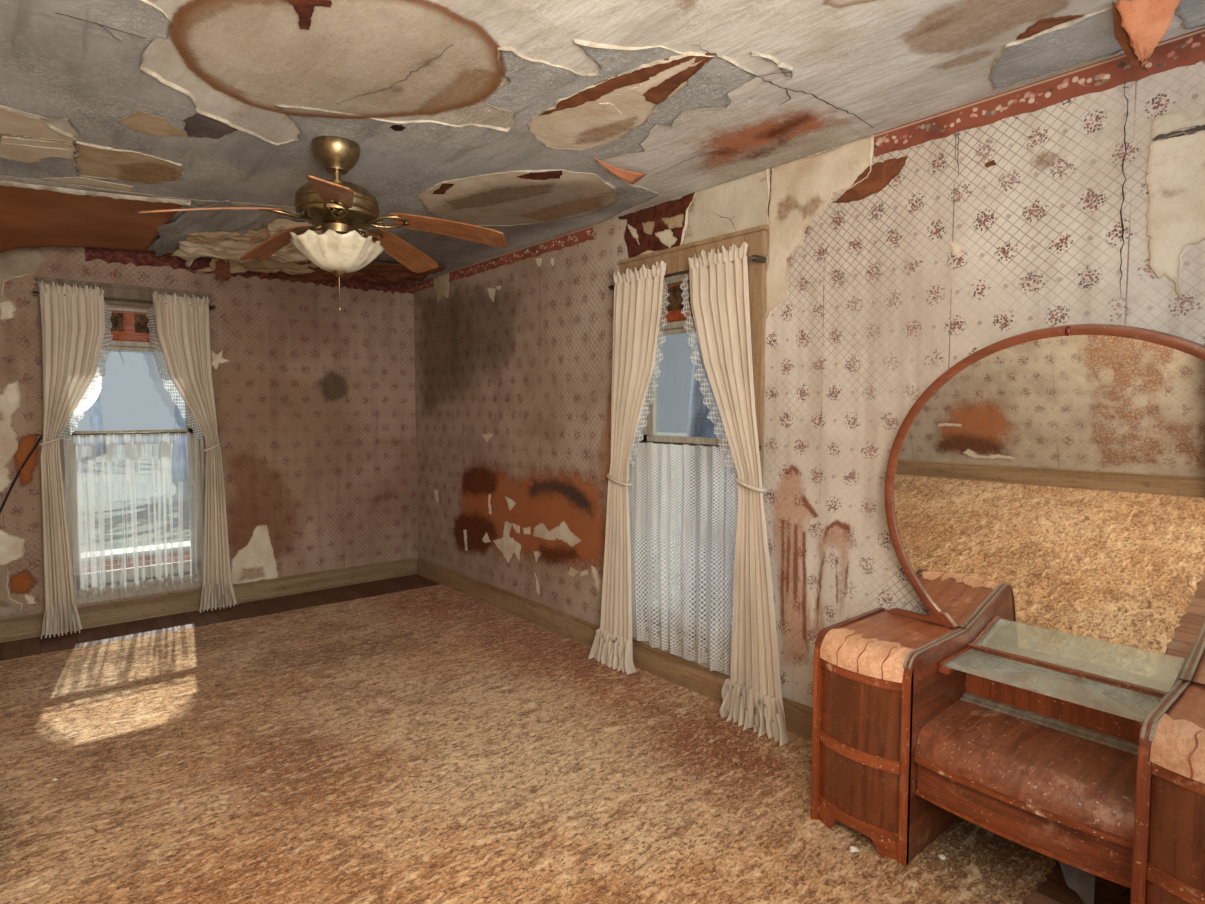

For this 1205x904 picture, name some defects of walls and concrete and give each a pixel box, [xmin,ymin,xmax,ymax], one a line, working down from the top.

damp [169,0,506,119]
crack [697,45,874,128]
peeling [989,3,1123,90]
peeling [1174,0,1205,30]
peeling [0,0,794,284]
damp [705,112,824,164]
crack [1120,83,1128,290]
peeling [4,383,20,413]
damp [320,373,346,400]
peeling [0,530,25,565]